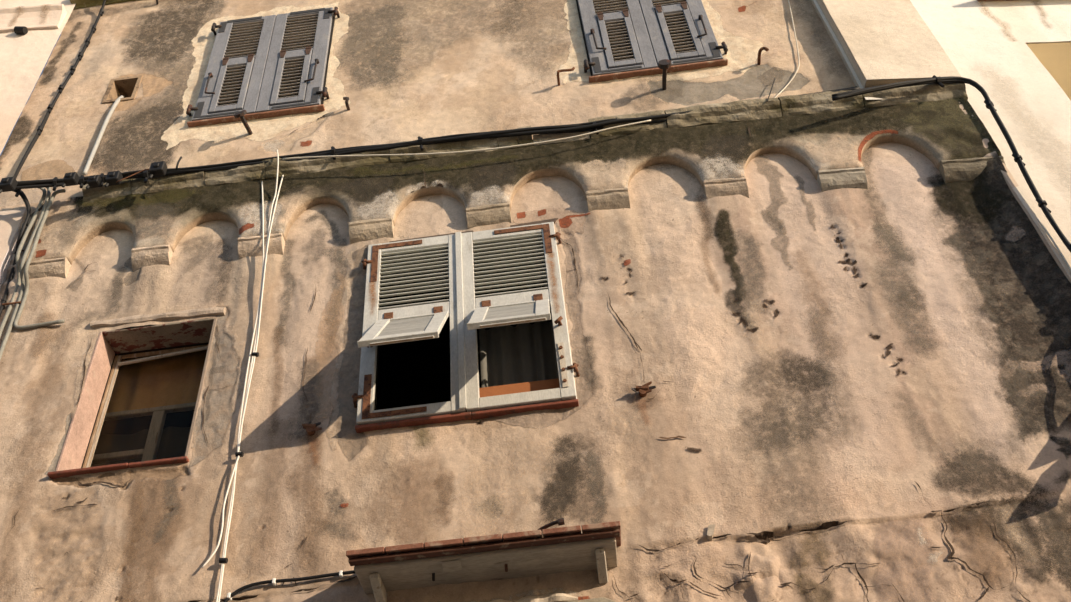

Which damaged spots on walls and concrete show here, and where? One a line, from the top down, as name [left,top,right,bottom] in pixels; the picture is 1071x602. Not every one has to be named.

water stain [82,0,223,172]
spalling [260,116,327,154]
water stain [338,6,402,85]
water stain [699,136,742,180]
water stain [757,155,791,267]
water stain [725,234,770,329]
water stain [928,128,1071,458]
spalling [45,306,244,499]
water stain [541,440,604,524]
crack [636,520,904,602]
crack [916,482,1053,602]
water stain [935,452,1071,583]